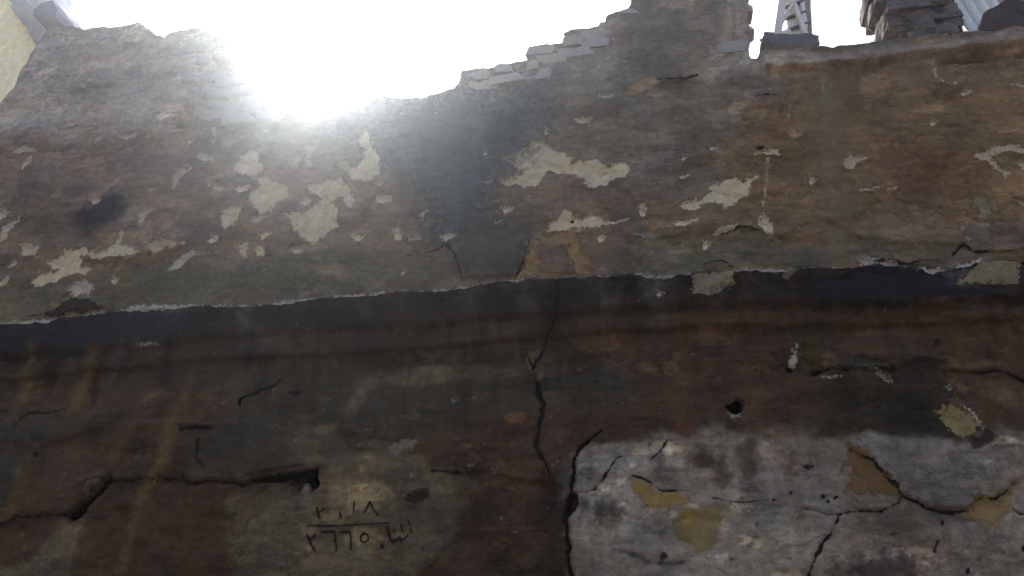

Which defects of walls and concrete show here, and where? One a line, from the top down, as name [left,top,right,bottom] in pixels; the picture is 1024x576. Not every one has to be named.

peeling [486,126,630,188]
peeling [974,143,1024,180]
leakage [75,192,127,230]
peeling [0,127,393,324]
spalling [460,203,661,289]
peeling [672,174,759,226]
spalling [688,259,843,296]
crack [238,378,302,406]
crack [528,279,621,576]
crack [112,468,320,493]
spalling [821,441,1024,528]
crack [807,501,900,576]